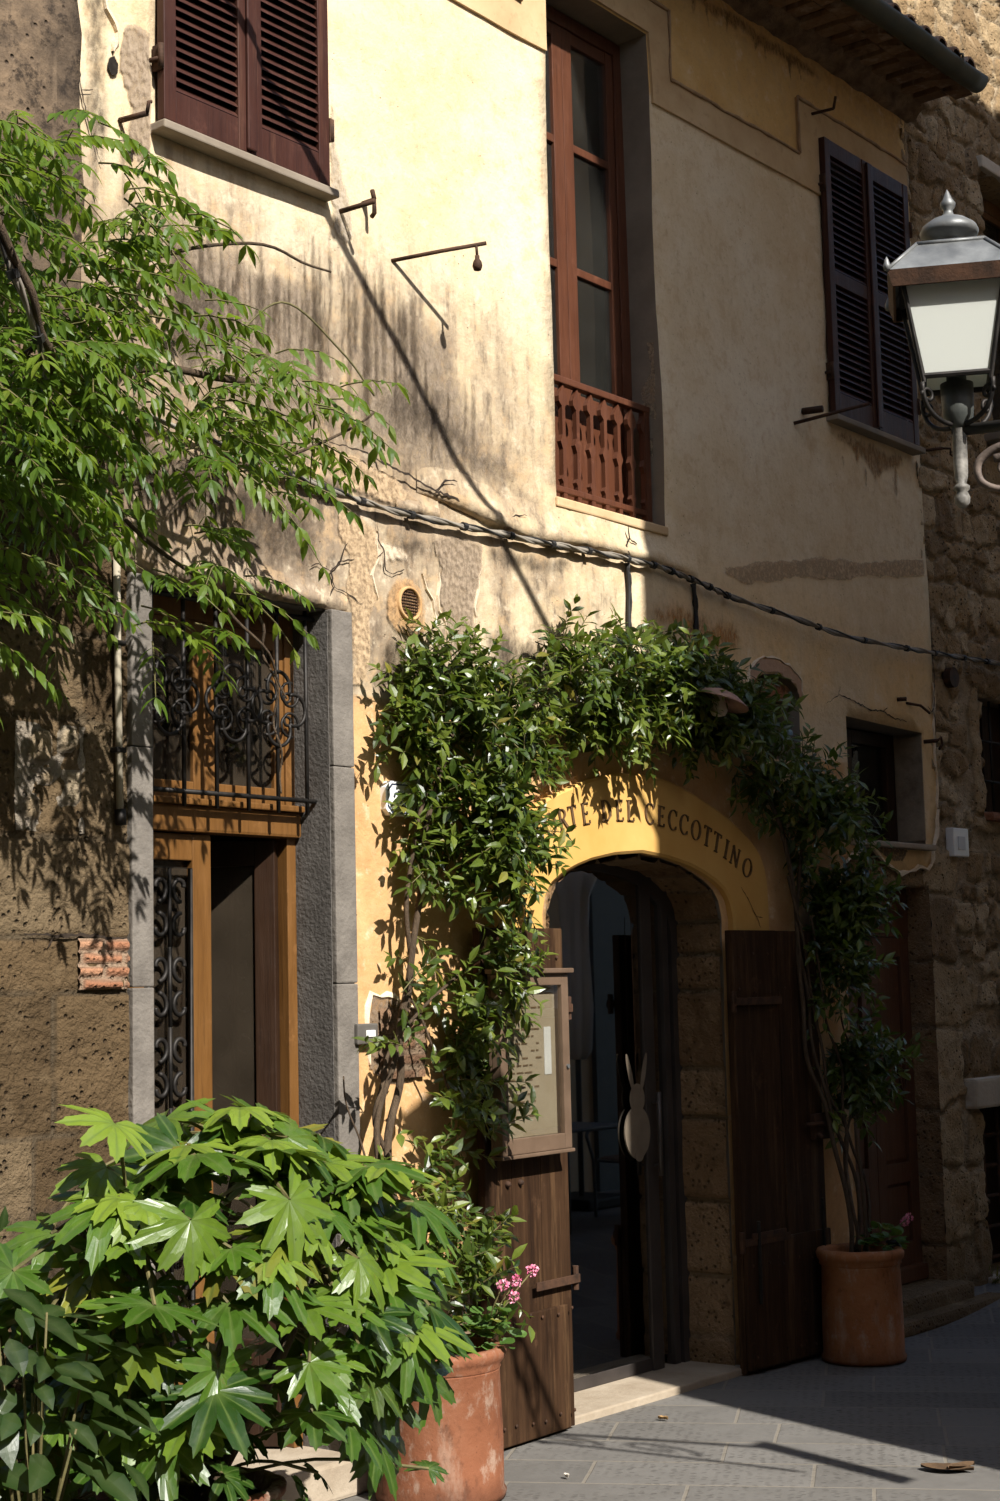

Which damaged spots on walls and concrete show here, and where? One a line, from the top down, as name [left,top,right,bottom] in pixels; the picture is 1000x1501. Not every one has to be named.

damp [161,217,500,473]
crack [311,521,404,604]
spalling [14,720,85,834]
spalling [78,938,130,990]